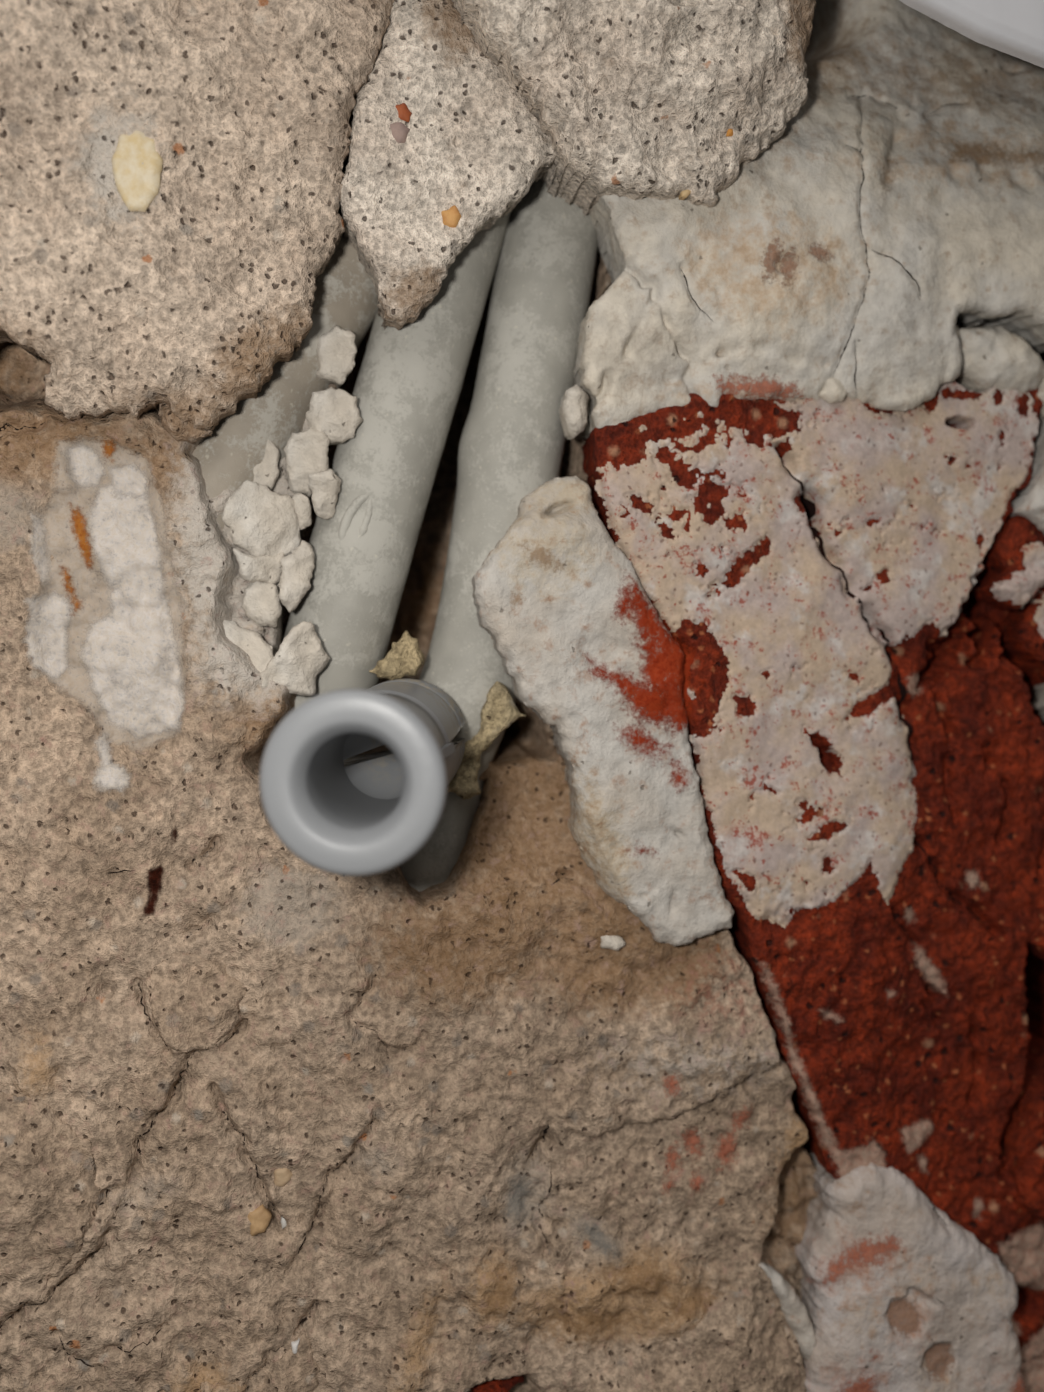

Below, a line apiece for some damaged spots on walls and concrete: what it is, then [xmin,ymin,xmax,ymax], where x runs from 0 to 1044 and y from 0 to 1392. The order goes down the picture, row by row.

spalling [762,238,834,285]
crack [833,91,921,397]
peeling [595,380,1040,928]
crack [777,450,917,775]
peeling [915,948,947,994]
crack [0,1187,117,1328]
crack [137,982,237,1154]
crack [222,1110,376,1270]
peeling [760,961,838,1146]
peeling [901,1120,933,1173]
peeling [999,1221,1044,1290]
crack [59,1325,165,1367]